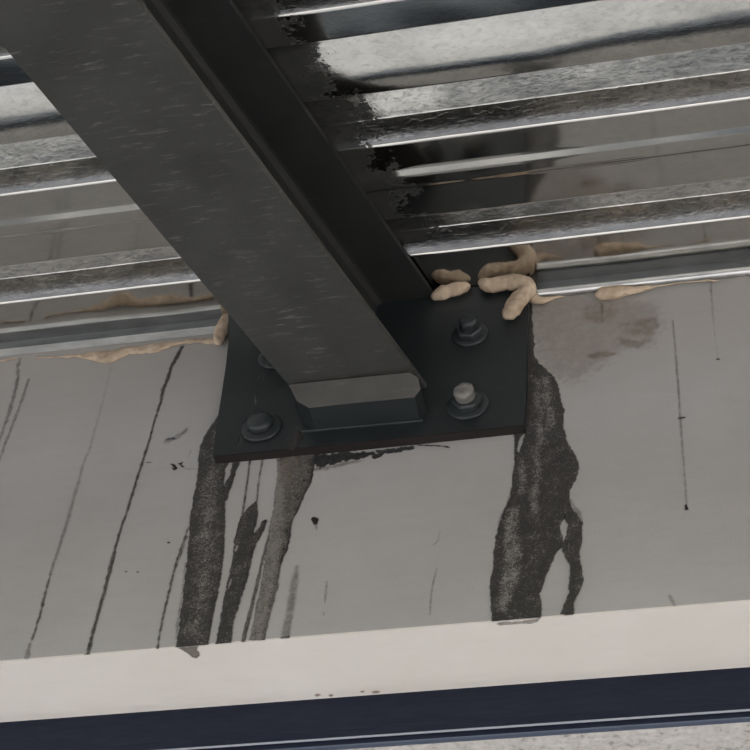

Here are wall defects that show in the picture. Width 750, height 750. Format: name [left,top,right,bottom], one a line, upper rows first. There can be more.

leakage [176,416,258,647]
leakage [249,454,317,641]
leakage [490,303,579,622]